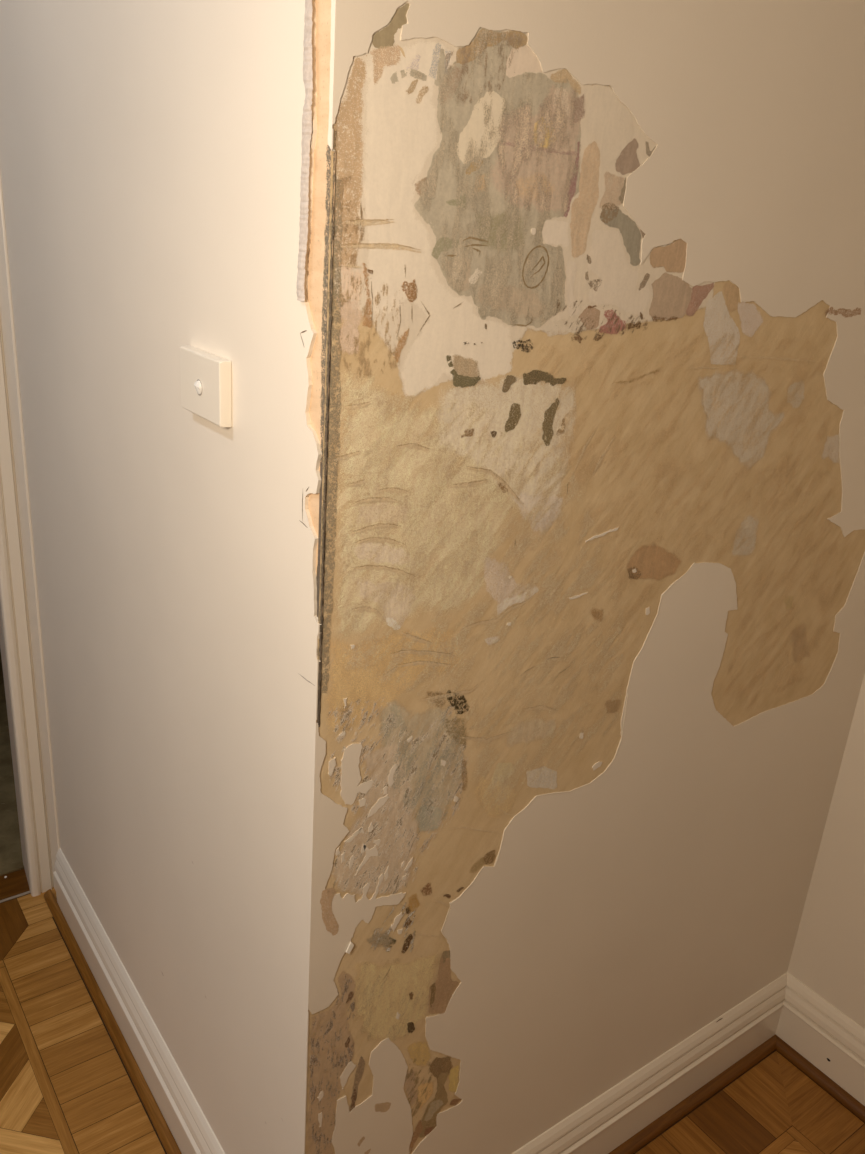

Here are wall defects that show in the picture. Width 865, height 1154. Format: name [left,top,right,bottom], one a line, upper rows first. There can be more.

peeling [296,0,865,1154]